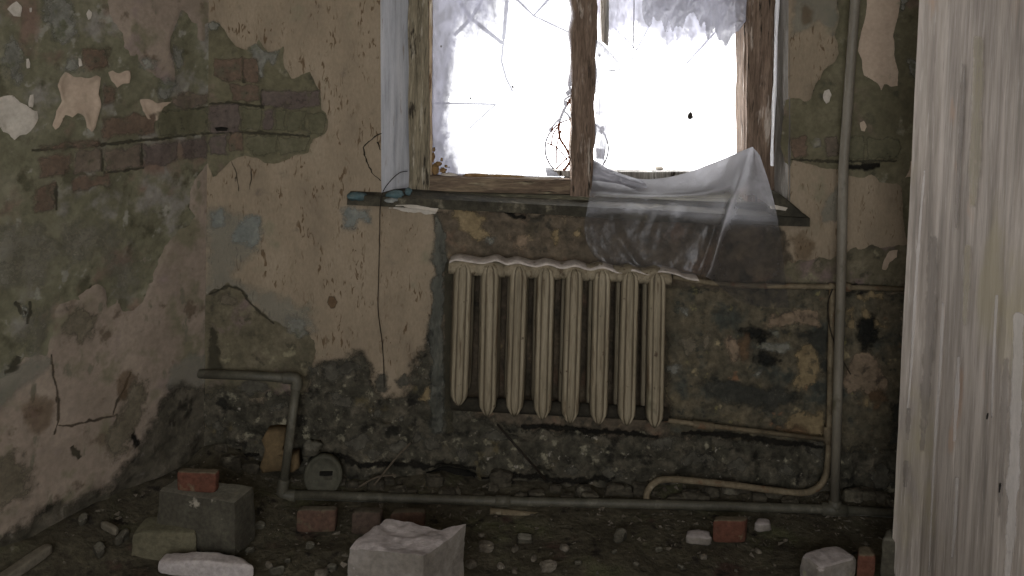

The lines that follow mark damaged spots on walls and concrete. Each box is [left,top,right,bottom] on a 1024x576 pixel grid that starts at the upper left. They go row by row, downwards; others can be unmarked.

flaking render [0,0,328,373]
spalling [754,0,919,293]
crack [50,354,131,435]
flaking render [204,283,316,399]
damp [0,171,925,547]